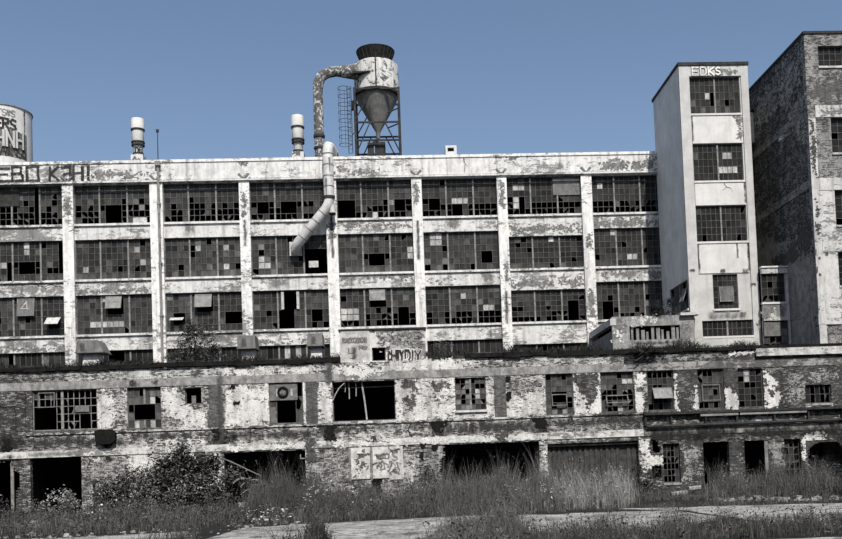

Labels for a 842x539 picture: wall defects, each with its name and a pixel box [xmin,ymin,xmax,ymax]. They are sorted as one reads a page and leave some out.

peeling [733,112,744,141]
peeling [755,41,842,178]
peeling [91,169,149,181]
peeling [336,166,380,176]
peeling [498,180,507,209]
spalling [771,198,821,266]
peeling [3,370,120,429]
peeling [57,326,842,495]